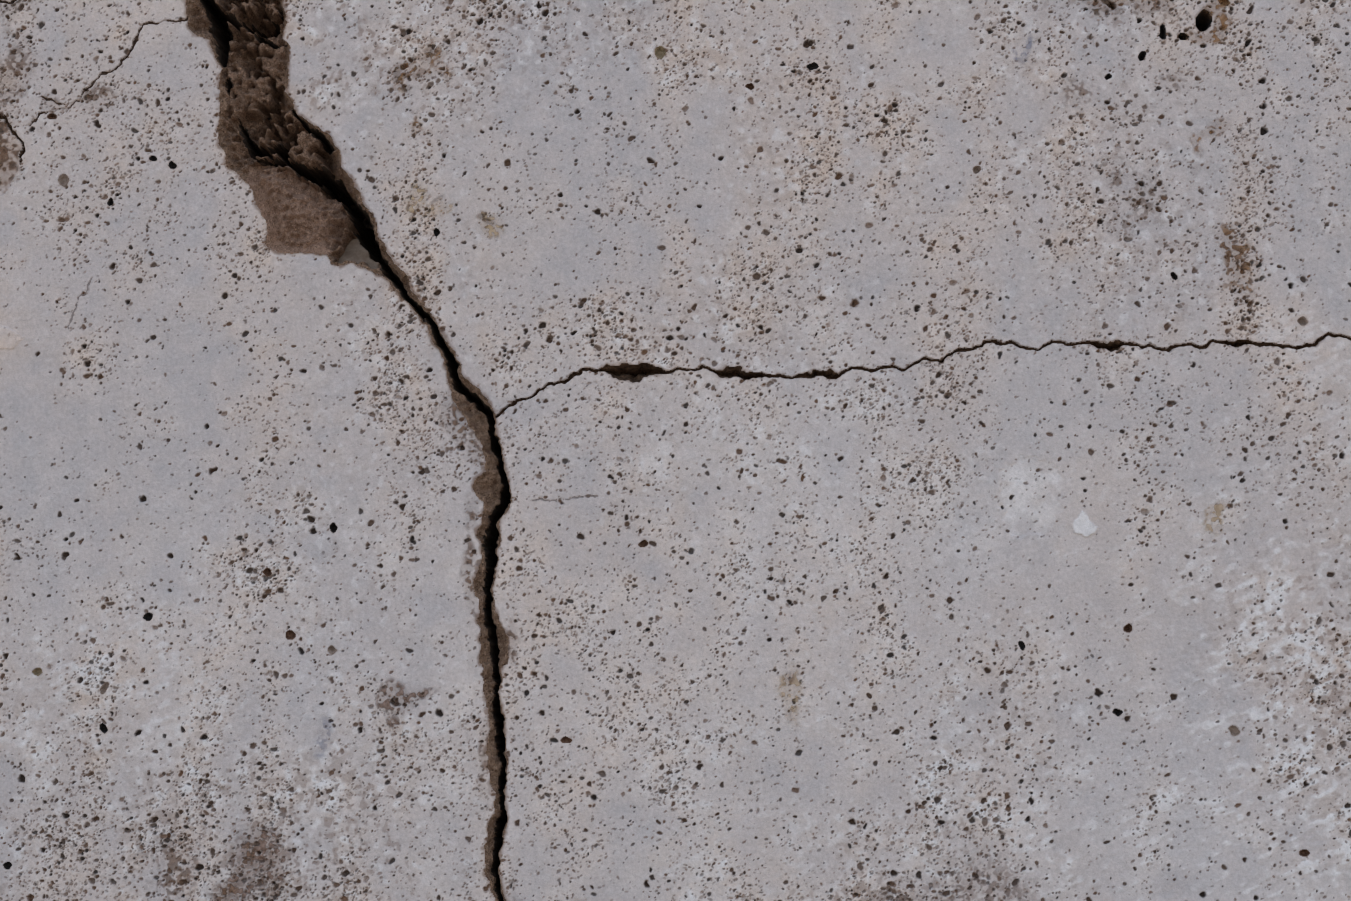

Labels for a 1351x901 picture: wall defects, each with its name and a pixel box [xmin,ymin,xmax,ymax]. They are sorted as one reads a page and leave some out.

crack [41,21,159,110]
crack [495,332,1351,418]
crack [167,0,512,901]
crack [532,494,598,502]